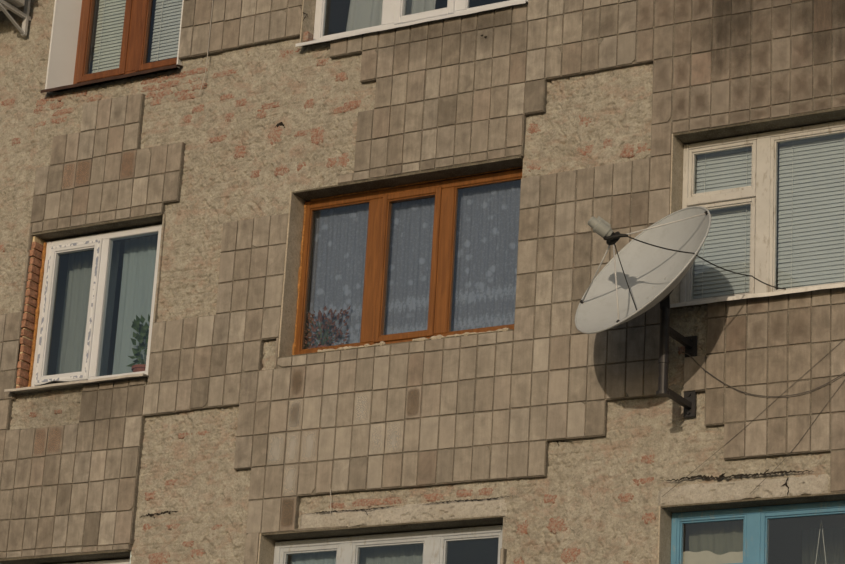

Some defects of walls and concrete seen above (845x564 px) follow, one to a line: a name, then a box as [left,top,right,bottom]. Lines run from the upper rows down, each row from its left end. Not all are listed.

spalling [0,0,376,322]
spalling [523,64,653,178]
spalling [10,387,83,430]
spalling [131,406,251,564]
spalling [298,305,831,564]
crack [663,469,814,495]